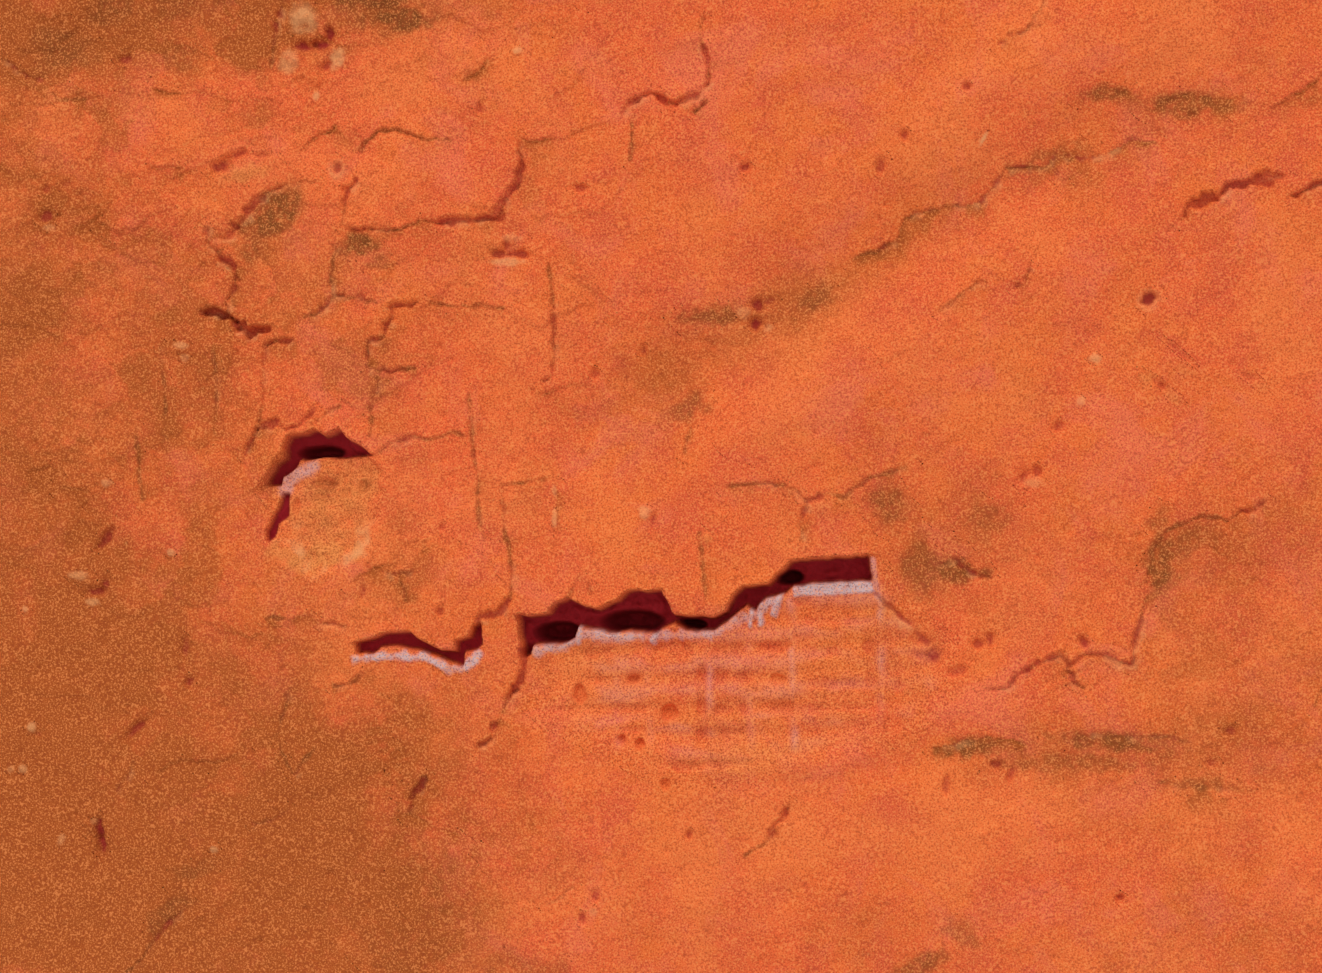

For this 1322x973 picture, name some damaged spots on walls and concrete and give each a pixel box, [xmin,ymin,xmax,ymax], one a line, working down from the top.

crack [615,11,718,171]
crack [841,132,1167,270]
crack [1173,168,1322,230]
crack [194,124,567,638]
spalling [239,400,386,606]
spalling [349,629,485,677]
spalling [507,552,999,793]
crack [926,552,1001,586]
crack [923,731,1035,756]
crack [974,493,1276,799]